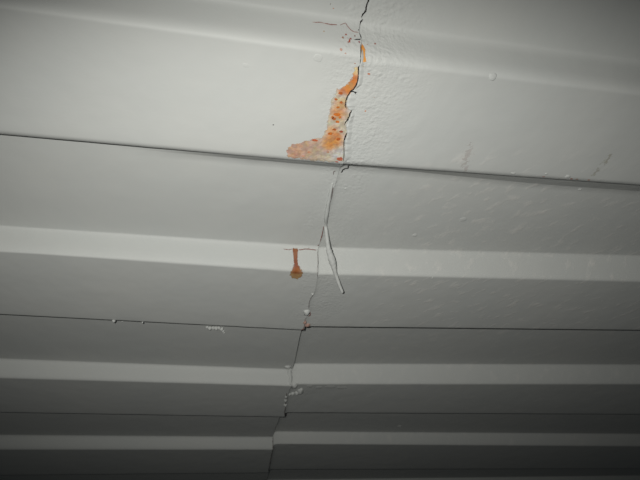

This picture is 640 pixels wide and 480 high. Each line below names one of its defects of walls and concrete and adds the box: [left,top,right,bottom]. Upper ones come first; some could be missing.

corrosion [286,34,366,162]
crack [315,0,369,198]
corrosion [285,248,315,279]